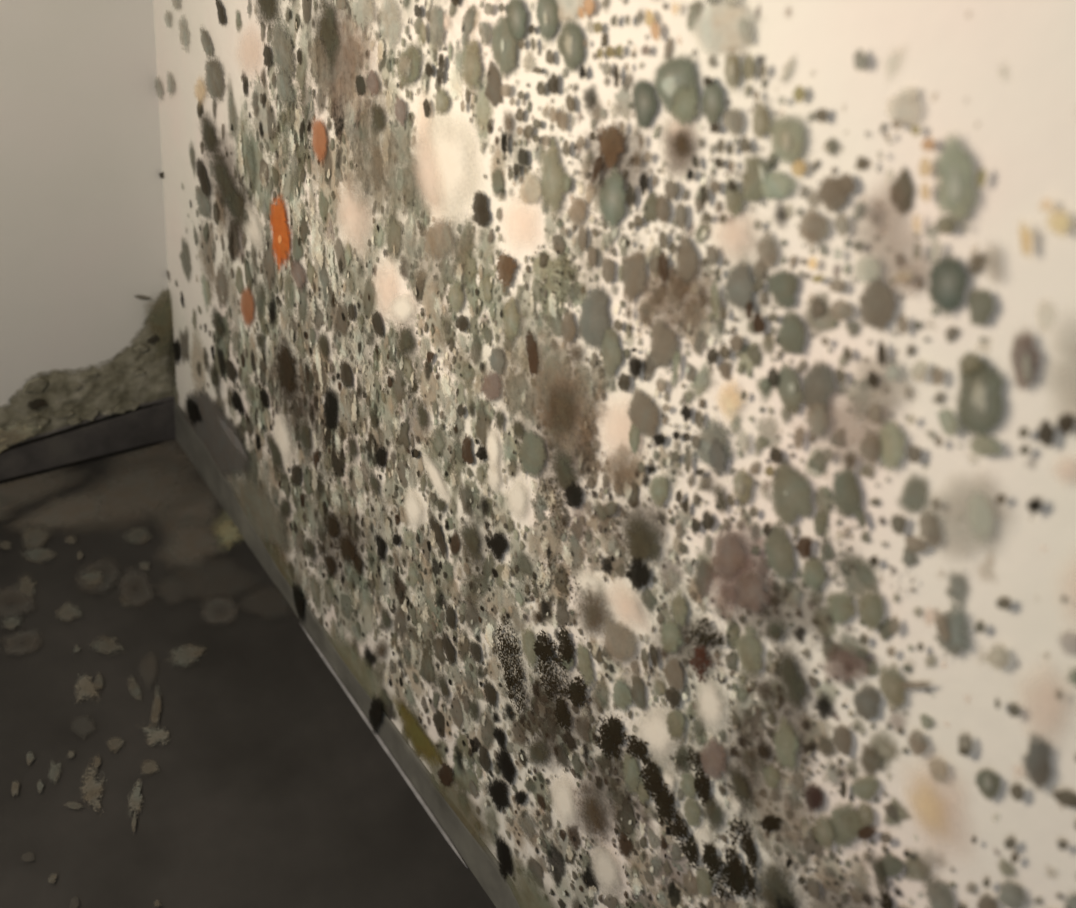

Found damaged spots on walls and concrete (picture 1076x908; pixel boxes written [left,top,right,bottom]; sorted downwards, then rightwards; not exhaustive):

leakage [780,168,934,283]
flaking render [0,290,175,437]
leakage [807,296,928,427]
leakage [17,0,877,908]
mould [1019,414,1075,455]
mould [900,476,941,512]
mould [1026,497,1042,515]
mould [793,487,919,602]
mould [947,574,966,606]
leakage [878,617,900,657]
mould [848,735,896,776]
mould [874,792,911,825]